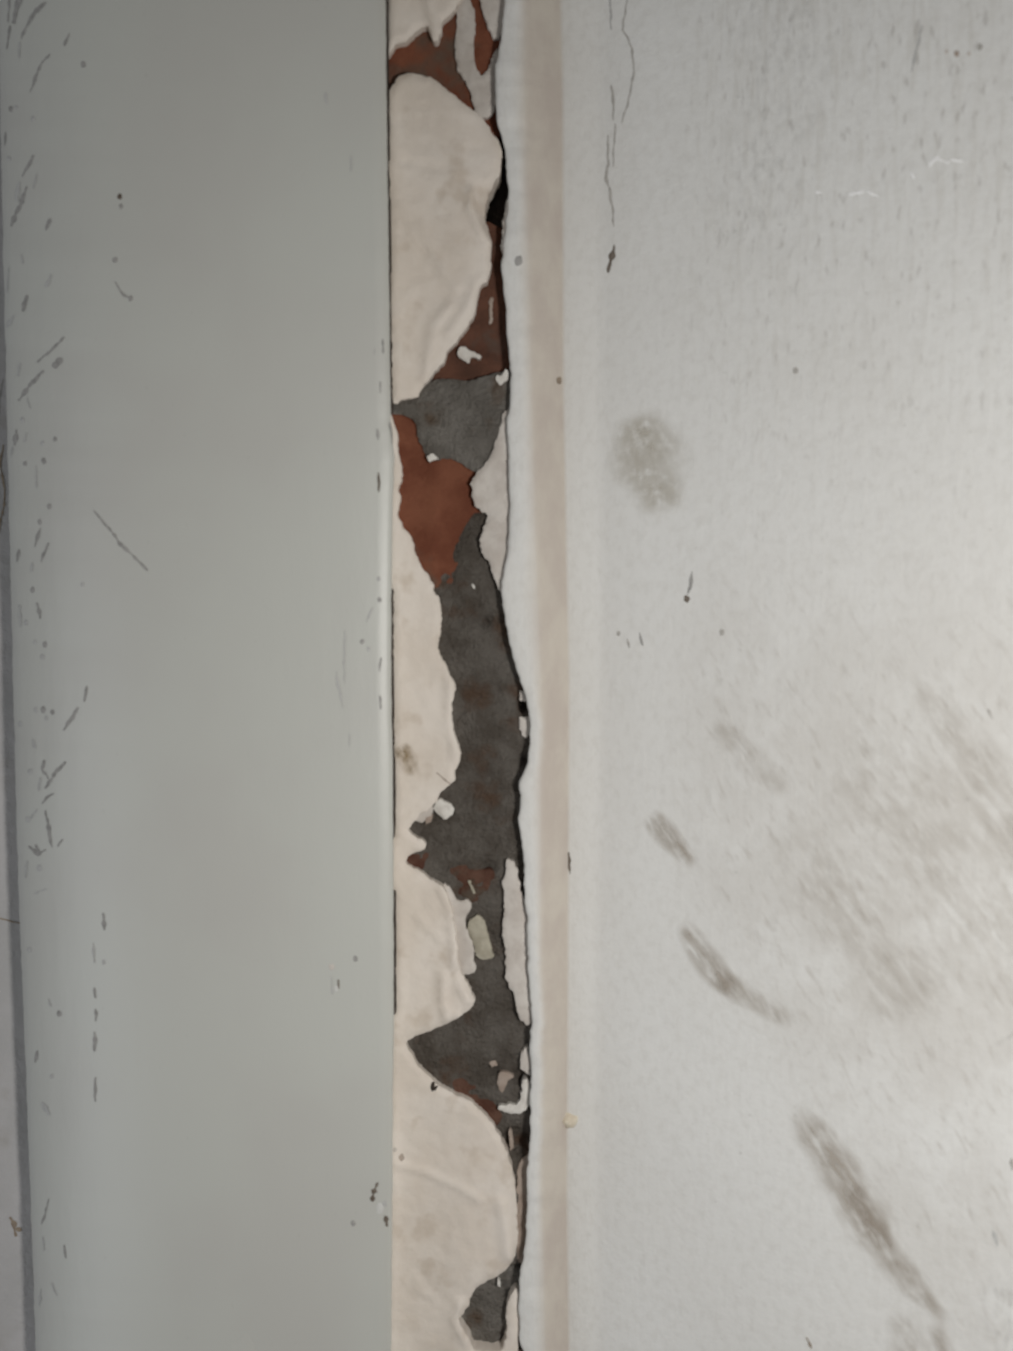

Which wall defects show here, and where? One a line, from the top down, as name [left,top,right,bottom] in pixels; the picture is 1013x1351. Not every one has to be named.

spalling [370,0,532,1351]